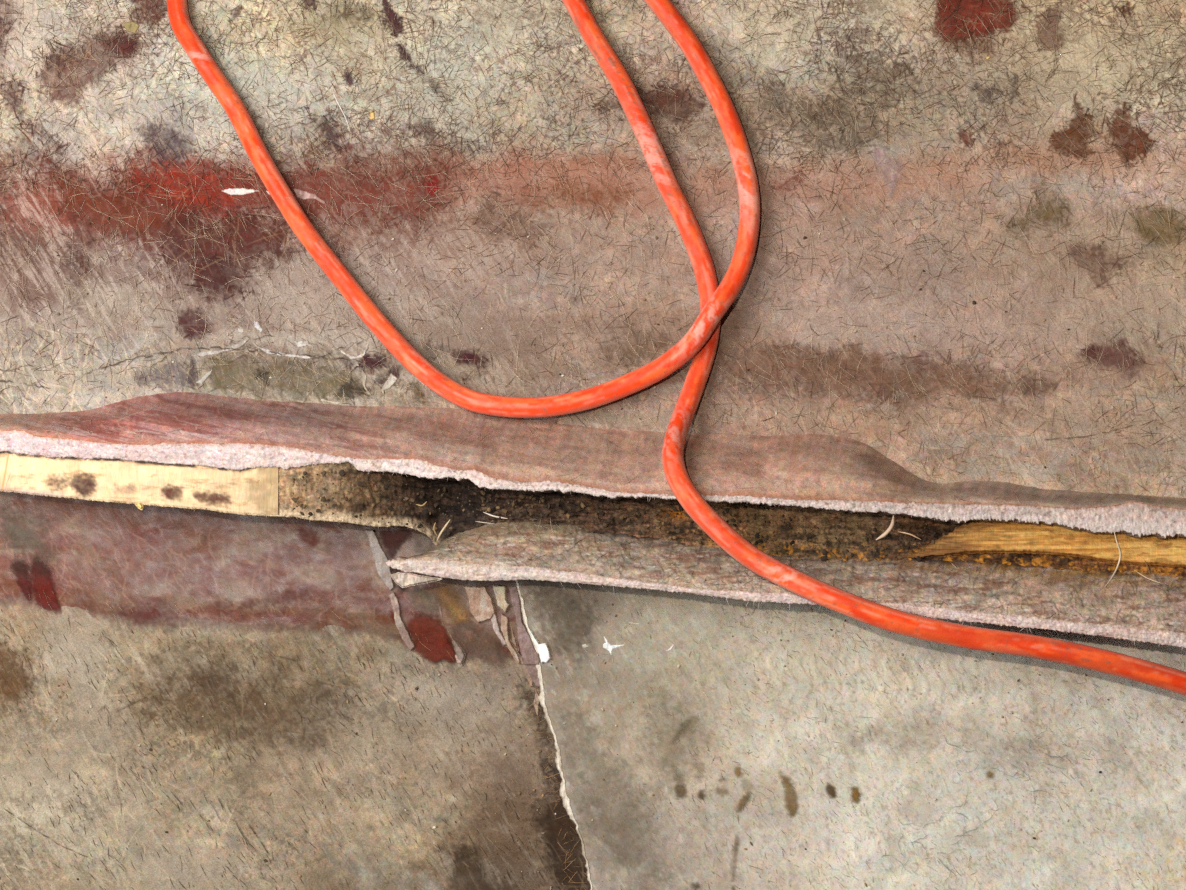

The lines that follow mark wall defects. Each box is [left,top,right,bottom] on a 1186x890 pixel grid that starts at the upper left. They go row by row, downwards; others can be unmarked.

peeling [191,321,320,359]
peeling [337,338,398,396]
peeling [365,529,551,717]
water stain [0,642,31,695]
water stain [133,672,316,746]
water stain [524,690,639,890]
water stain [675,778,703,799]
water stain [781,776,797,816]
water stain [402,846,504,890]